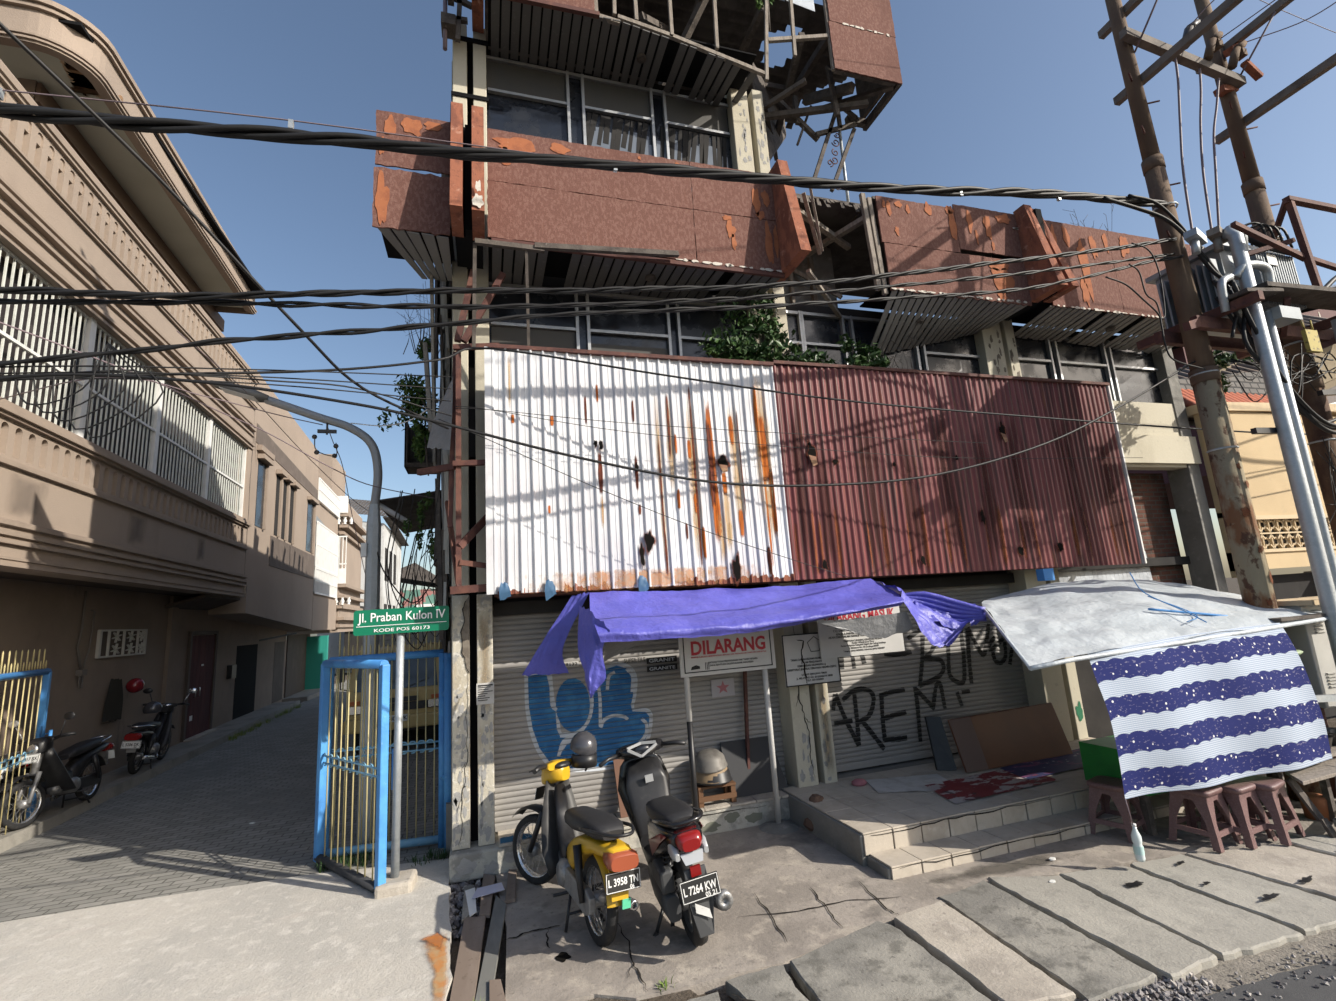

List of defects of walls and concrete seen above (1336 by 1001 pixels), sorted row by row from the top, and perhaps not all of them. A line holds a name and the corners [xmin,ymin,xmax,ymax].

peeling [738,102,769,164]
corrosion [498,387,842,595]
corrosion [862,438,930,567]
corrosion [978,421,1042,562]
crack [618,924,648,991]